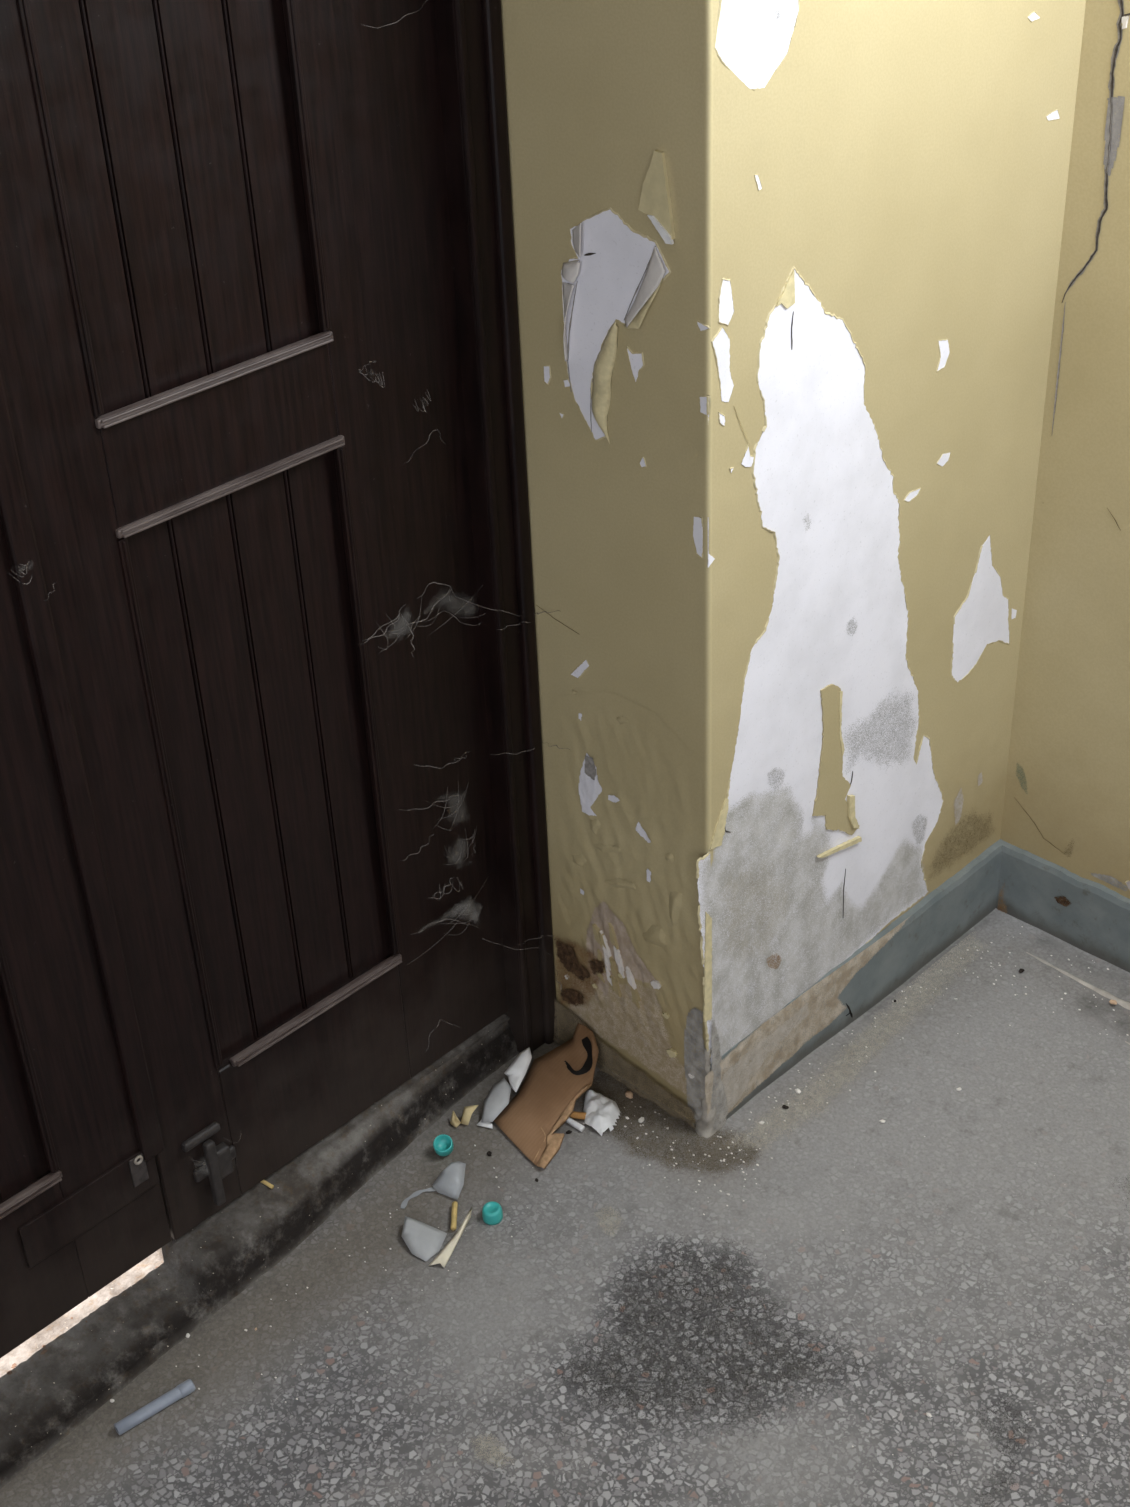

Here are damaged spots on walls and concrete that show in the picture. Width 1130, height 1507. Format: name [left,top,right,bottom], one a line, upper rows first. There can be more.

peeling [714,0,799,91]
peeling [544,150,675,444]
spalling [936,339,950,372]
spalling [936,452,951,467]
crack [1052,0,1130,432]
peeling [564,266,944,1138]
peeling [950,536,1017,682]
water stain [545,1234,864,1447]